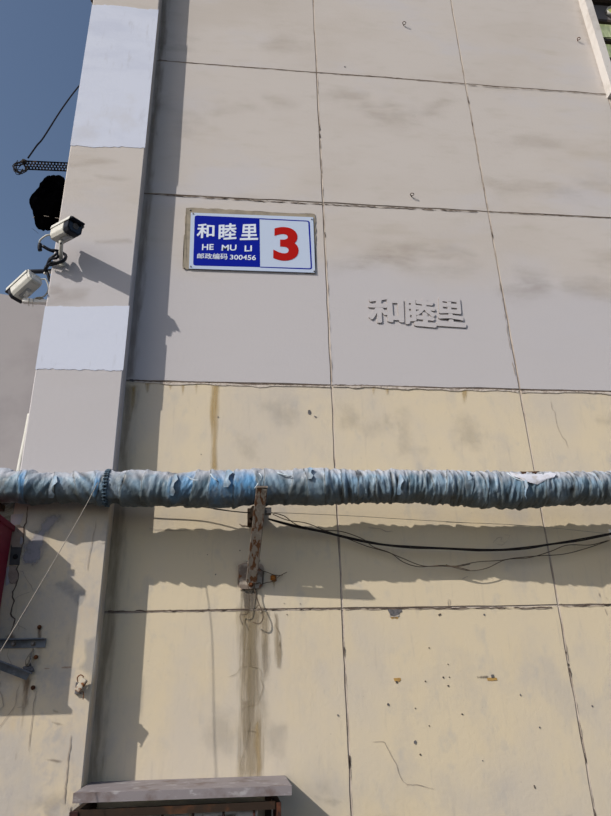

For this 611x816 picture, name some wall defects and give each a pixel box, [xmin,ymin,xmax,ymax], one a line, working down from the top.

crack [0,507,33,664]
damp [243,589,266,769]
crack [108,603,611,662]